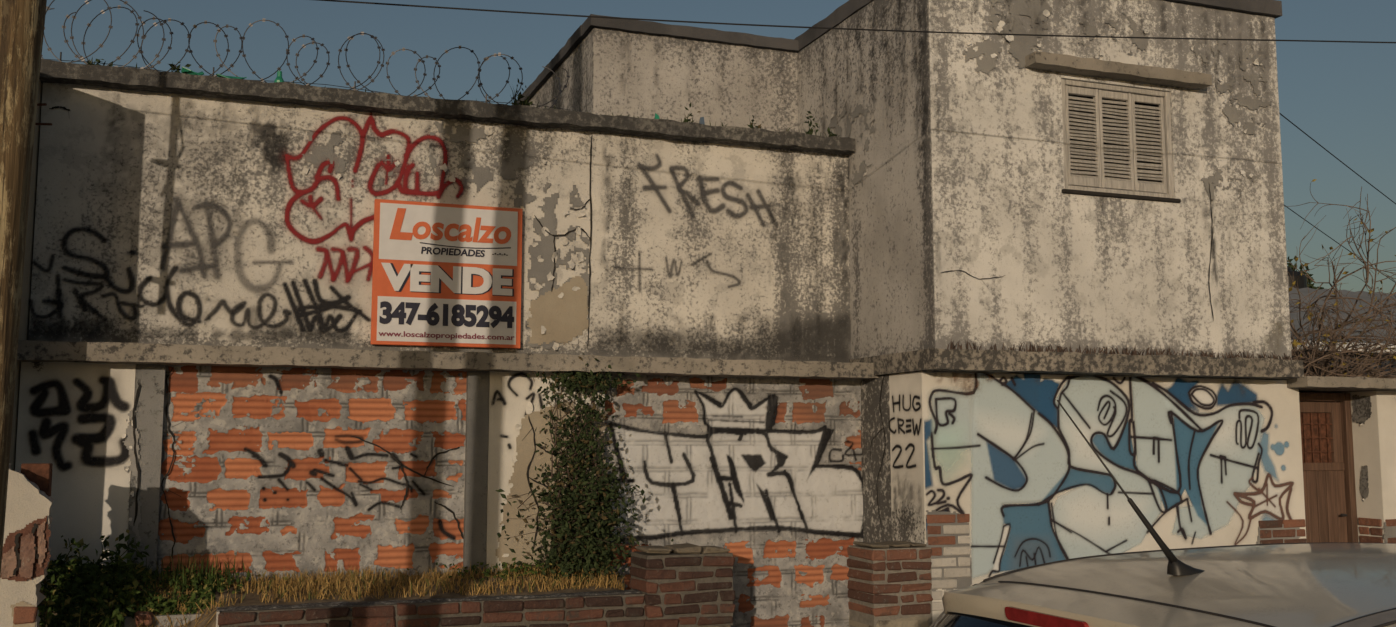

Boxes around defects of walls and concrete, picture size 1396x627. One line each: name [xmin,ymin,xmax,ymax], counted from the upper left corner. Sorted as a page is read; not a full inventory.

peeling [962,0,1052,75]
peeling [1076,12,1149,60]
water stain [255,123,286,167]
peeling [429,119,591,350]
spalling [0,516,51,582]
spalling [925,510,972,611]
spalling [10,601,38,627]